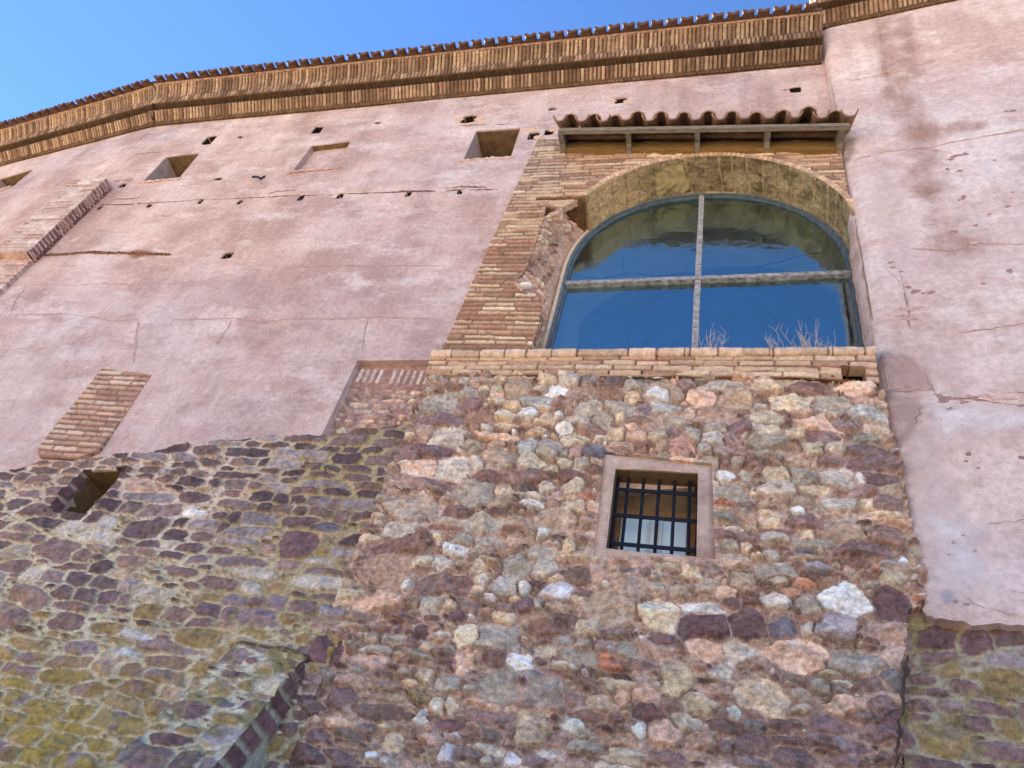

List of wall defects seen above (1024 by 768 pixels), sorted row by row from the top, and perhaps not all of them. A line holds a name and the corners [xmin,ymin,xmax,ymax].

crack [860,128,1024,158]
crack [44,249,171,257]
crack [906,242,1024,252]
crack [12,283,139,363]
crack [174,316,428,352]
crack [887,270,925,327]
crack [884,375,1024,426]
crack [884,654,912,768]